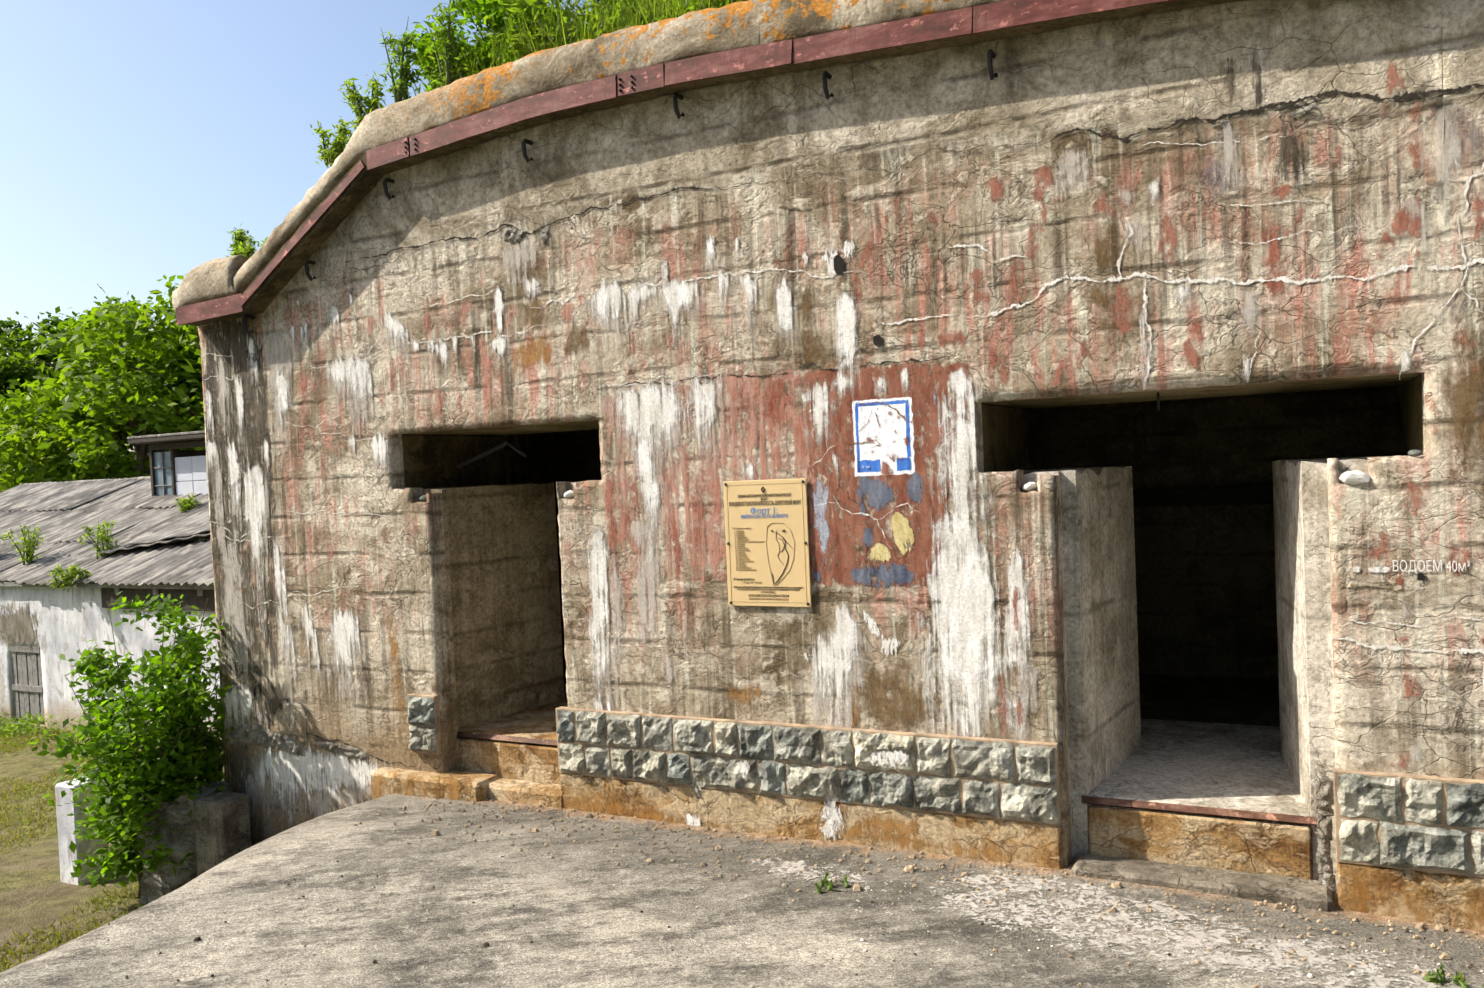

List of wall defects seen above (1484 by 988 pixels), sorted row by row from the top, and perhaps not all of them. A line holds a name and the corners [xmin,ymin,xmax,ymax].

crack [345,83,1484,271]
spalling [503,226,554,255]
crack [298,156,1484,385]
peeling [965,269,988,303]
peeling [475,337,492,405]
crack [275,408,386,441]
crack [598,356,966,465]
peeling [604,330,1008,588]
crack [819,496,915,549]
peeling [863,610,900,656]
crack [1315,578,1484,715]